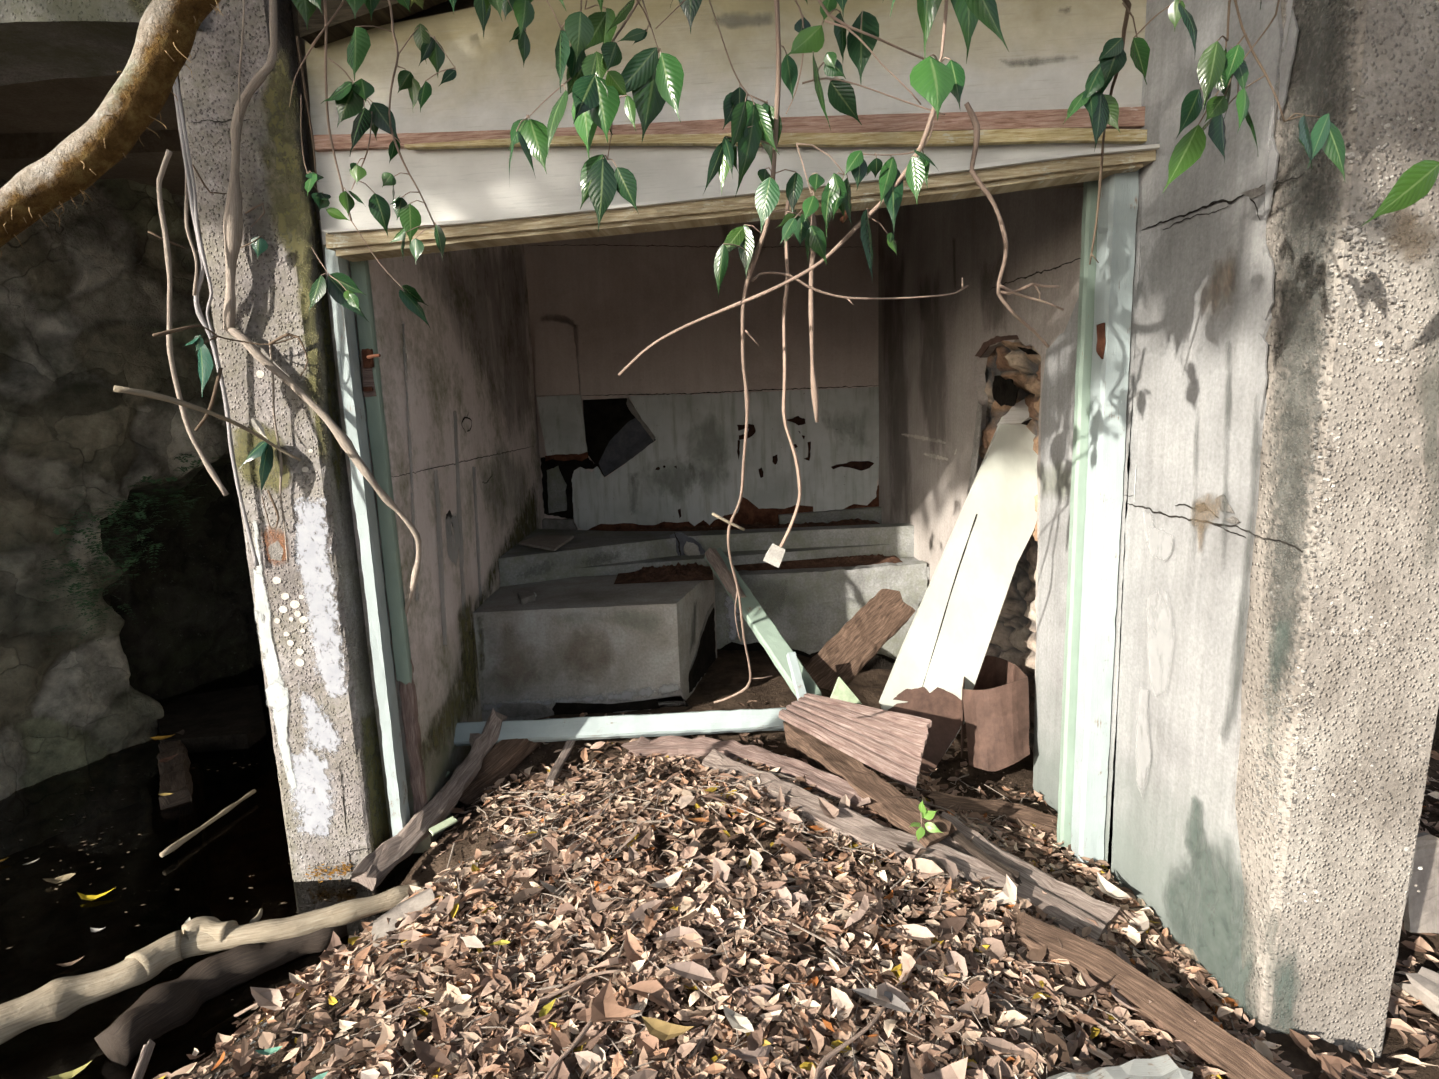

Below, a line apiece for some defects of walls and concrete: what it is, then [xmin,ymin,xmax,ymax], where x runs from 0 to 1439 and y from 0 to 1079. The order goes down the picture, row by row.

crack [1142,172,1305,230]
damp [261,56,341,497]
spalling [975,335,1038,358]
spalling [540,398,656,530]
spalling [968,375,1019,494]
crack [1127,494,1303,552]